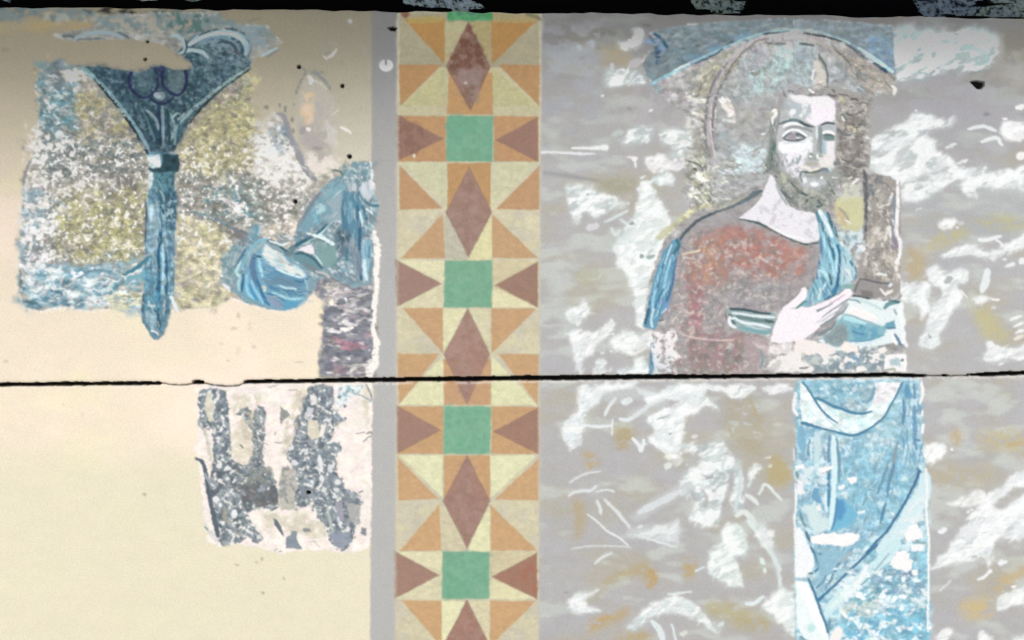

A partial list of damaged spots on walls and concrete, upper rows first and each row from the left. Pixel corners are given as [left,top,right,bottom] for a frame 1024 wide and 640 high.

peeling [870,104,1024,211]
peeling [938,219,965,230]
crack [0,368,1024,390]
peeling [562,125,796,640]
peeling [901,233,1024,350]
peeling [983,315,1024,366]